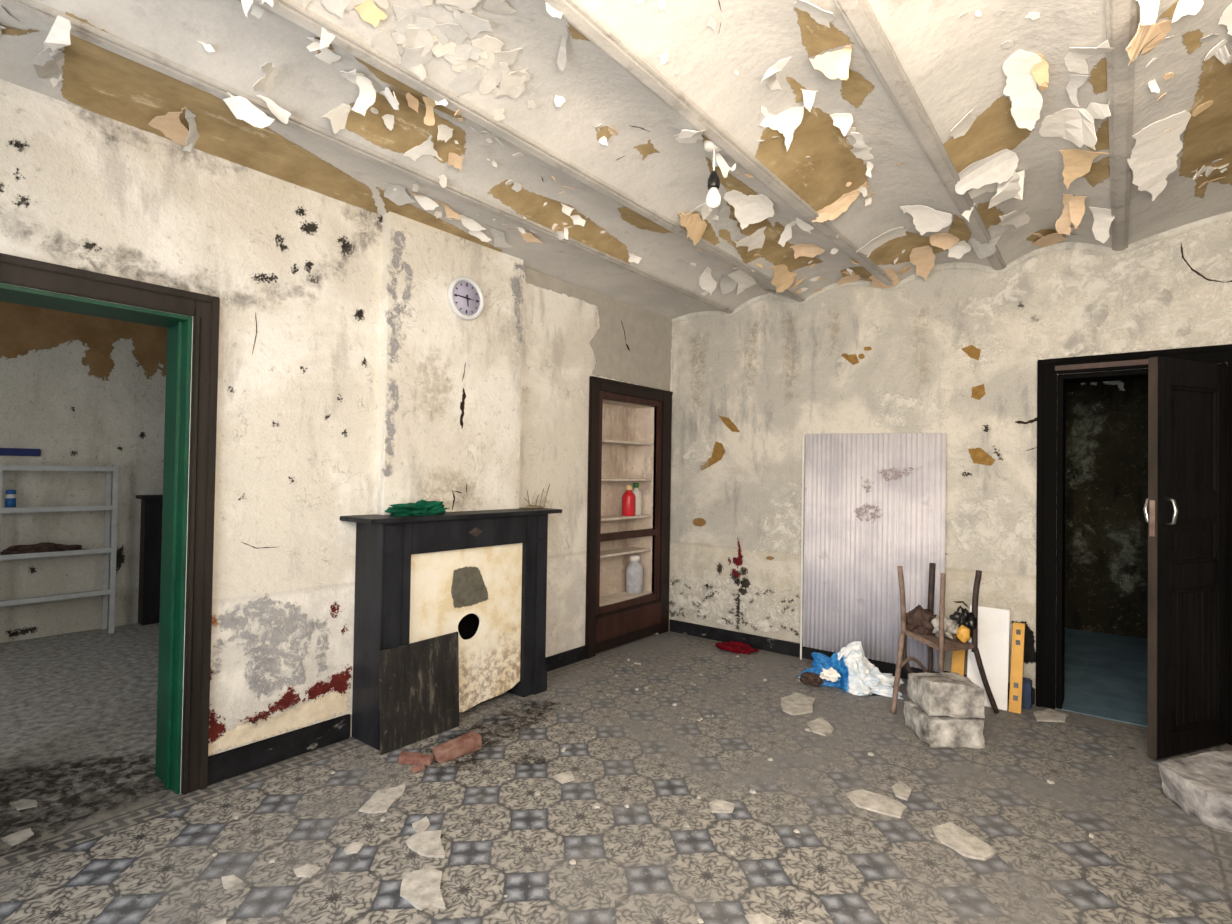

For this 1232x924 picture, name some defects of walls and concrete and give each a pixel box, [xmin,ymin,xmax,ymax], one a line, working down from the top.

water stain [0,168,31,208]
peeling [0,0,1232,367]
water stain [295,206,320,235]
water stain [337,236,367,267]
water stain [249,273,278,283]
water stain [291,260,320,285]
peeling [0,301,167,384]
peeling [382,381,399,476]
spalling [682,441,725,473]
spalling [968,448,995,466]
water stain [669,557,800,636]
peeling [208,596,352,756]